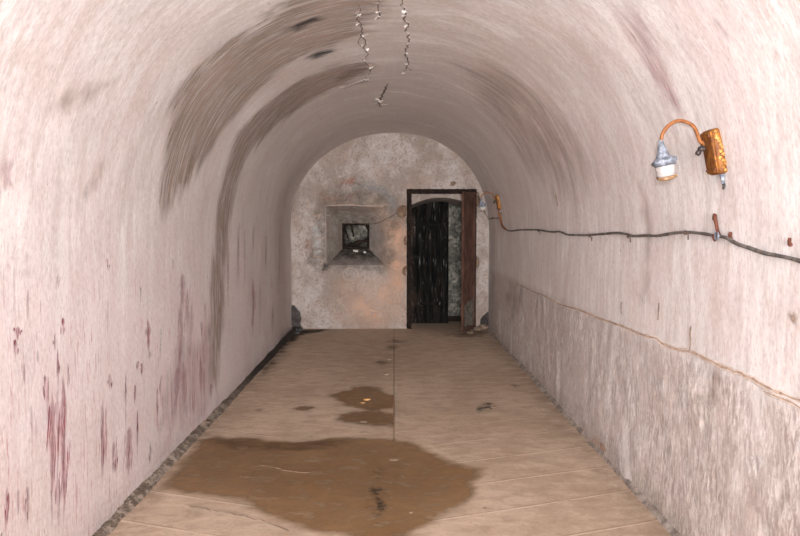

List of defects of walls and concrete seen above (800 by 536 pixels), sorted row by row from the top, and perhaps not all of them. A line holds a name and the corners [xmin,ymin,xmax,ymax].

leakage [160,0,379,205]
leakage [211,62,369,379]
rust [43,377,69,489]
leakage [168,438,478,536]
leakage [332,387,394,425]
crack [496,276,800,410]